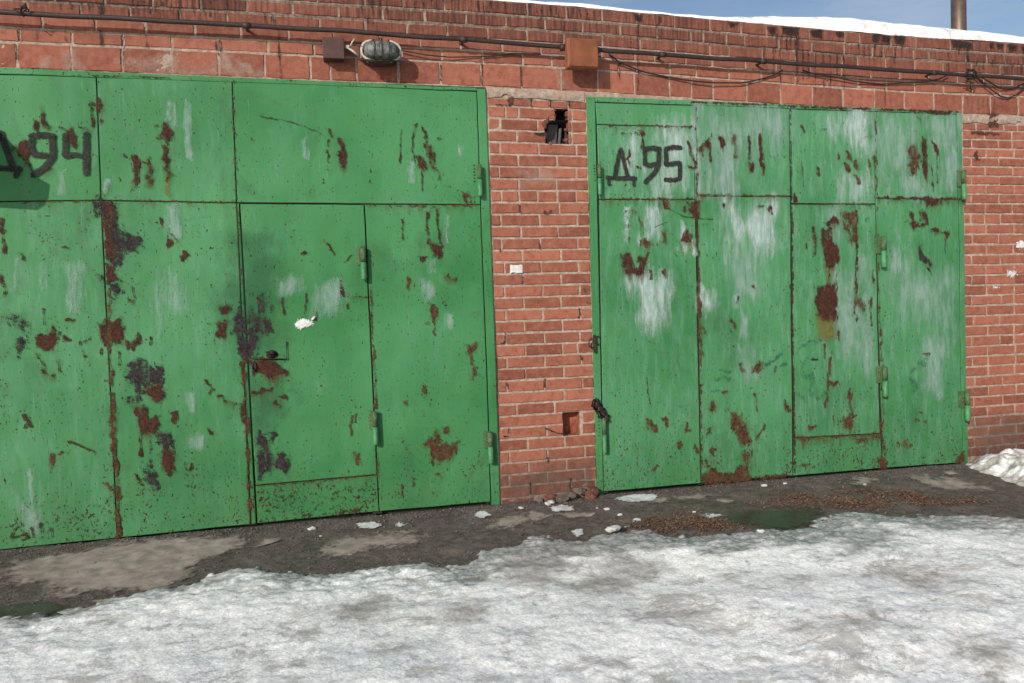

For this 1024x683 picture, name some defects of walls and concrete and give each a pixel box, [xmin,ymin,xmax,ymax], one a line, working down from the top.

rust [123,82,243,284]
rust [399,123,440,190]
spalling [542,108,570,145]
rust [22,199,152,539]
rust [134,384,193,477]
rust [239,351,379,521]
rust [340,280,378,409]
rust [423,426,460,475]
spalling [562,411,580,436]
rust [602,108,962,484]